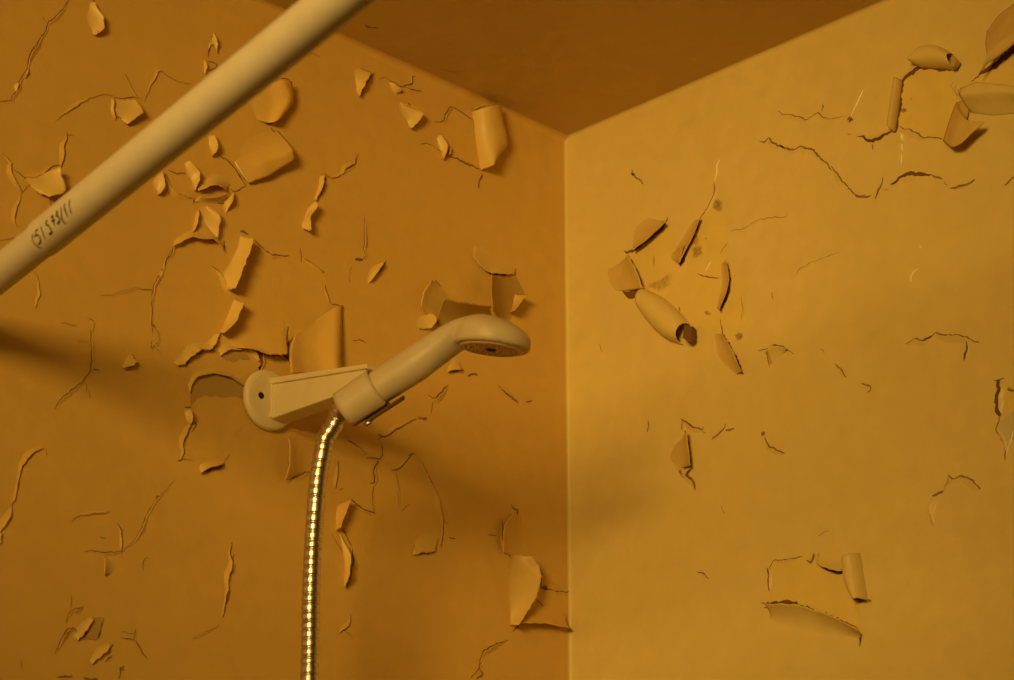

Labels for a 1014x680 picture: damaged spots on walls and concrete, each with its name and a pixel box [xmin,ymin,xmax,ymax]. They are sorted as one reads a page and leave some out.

crack [0,0,69,103]
peeling [848,4,1014,150]
peeling [423,104,508,189]
crack [760,104,975,198]
peeling [144,78,343,473]
peeling [416,246,528,330]
peeling [608,160,745,374]
crack [906,332,979,361]
crack [0,447,47,543]
crack [72,480,175,568]
crack [348,385,455,555]
peeling [763,553,871,645]